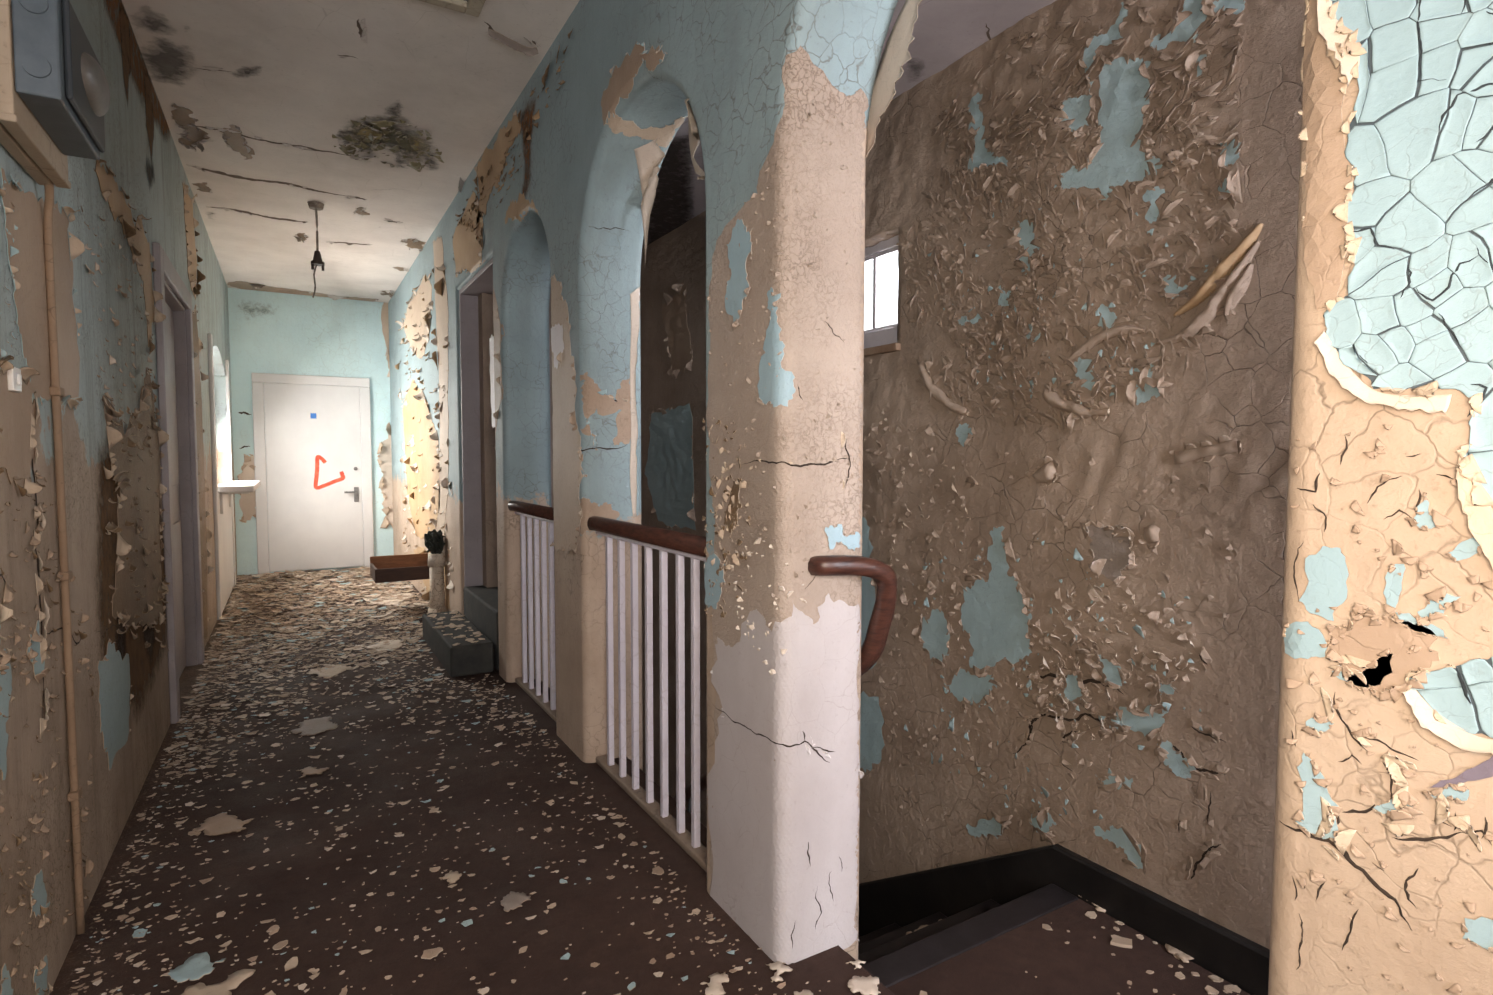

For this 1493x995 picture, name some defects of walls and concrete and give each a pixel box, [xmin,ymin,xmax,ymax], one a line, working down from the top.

peeling [0,159,170,995]
peeling [182,182,216,641]
peeling [171,103,255,159]
damp [347,108,434,169]
peeling [227,28,573,609]
peeling [550,0,1246,995]
crack [1293,437,1348,600]
peeling [1282,0,1493,869]
crack [1367,454,1453,518]
crack [1353,228,1493,347]
crack [1417,0,1493,134]
crack [1280,654,1492,970]